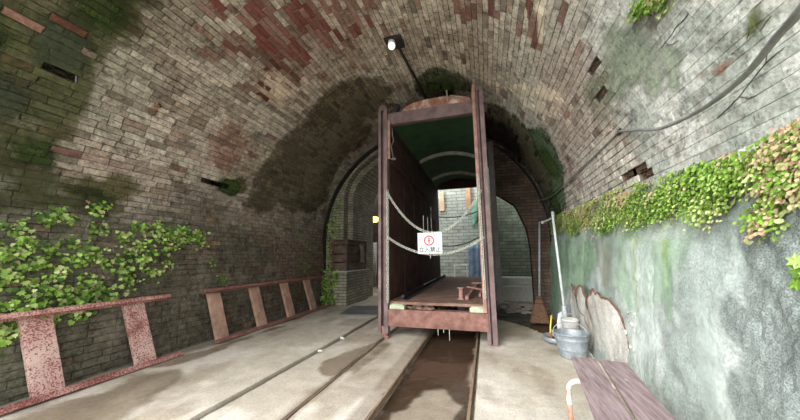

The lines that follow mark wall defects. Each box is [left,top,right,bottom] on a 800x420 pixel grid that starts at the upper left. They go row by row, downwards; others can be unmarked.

damp [247,76,394,215]